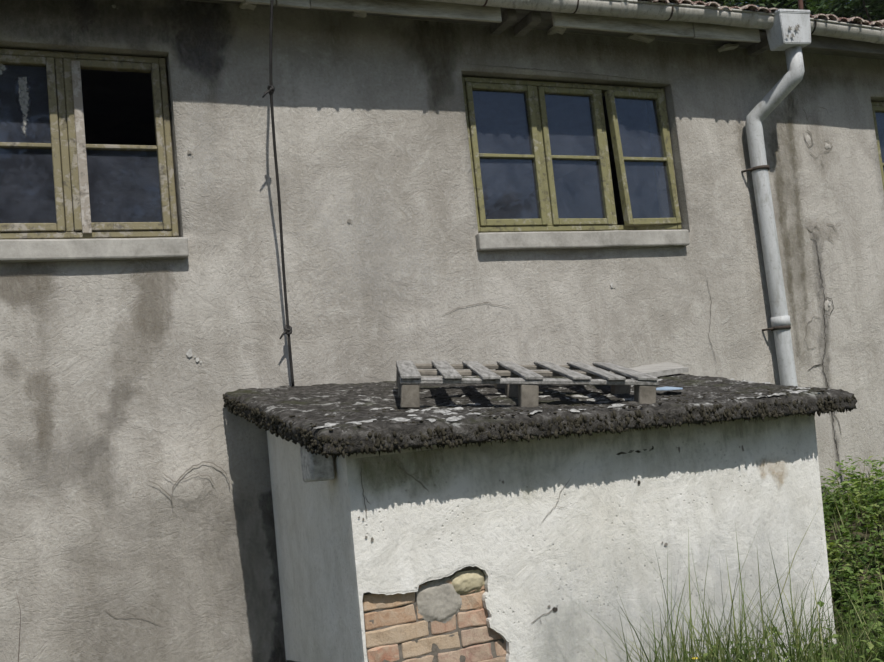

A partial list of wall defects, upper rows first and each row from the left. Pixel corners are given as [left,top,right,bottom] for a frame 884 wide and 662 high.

crack [805,235,829,388]
crack [832,413,842,477]
flaking render [358,562,513,662]